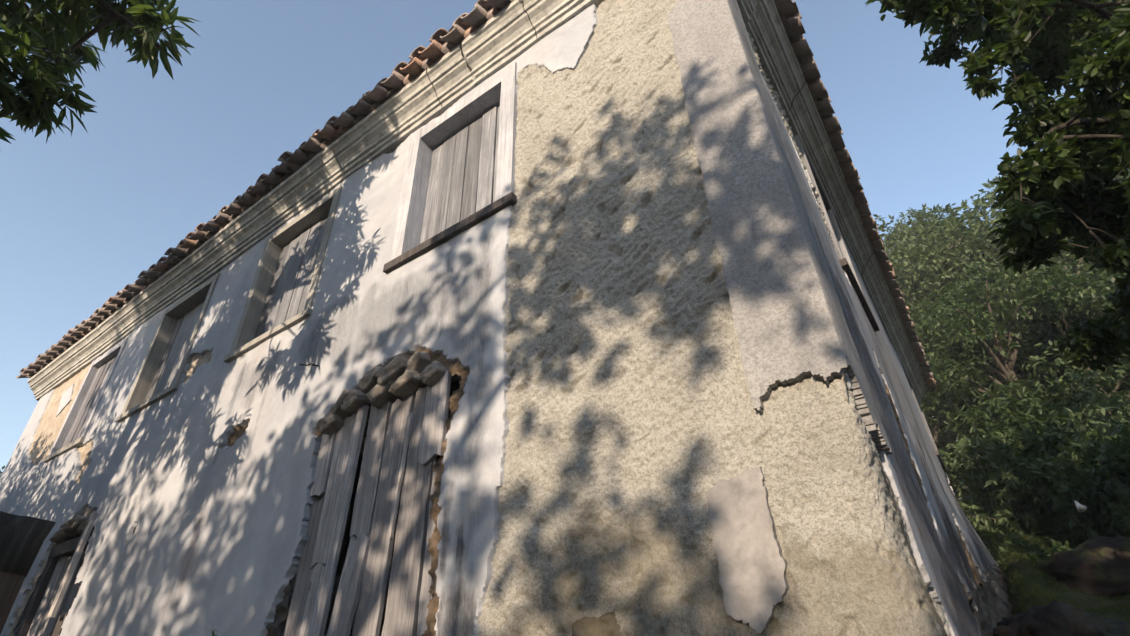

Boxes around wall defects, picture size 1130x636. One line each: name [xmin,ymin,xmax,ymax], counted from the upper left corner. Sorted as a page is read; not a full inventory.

spalling [477,0,952,636]
flaking render [28,363,91,467]
spalling [75,440,93,484]
spalling [222,421,250,448]
spalling [404,347,470,636]
leakage [829,261,1000,636]
spalling [954,520,1013,636]